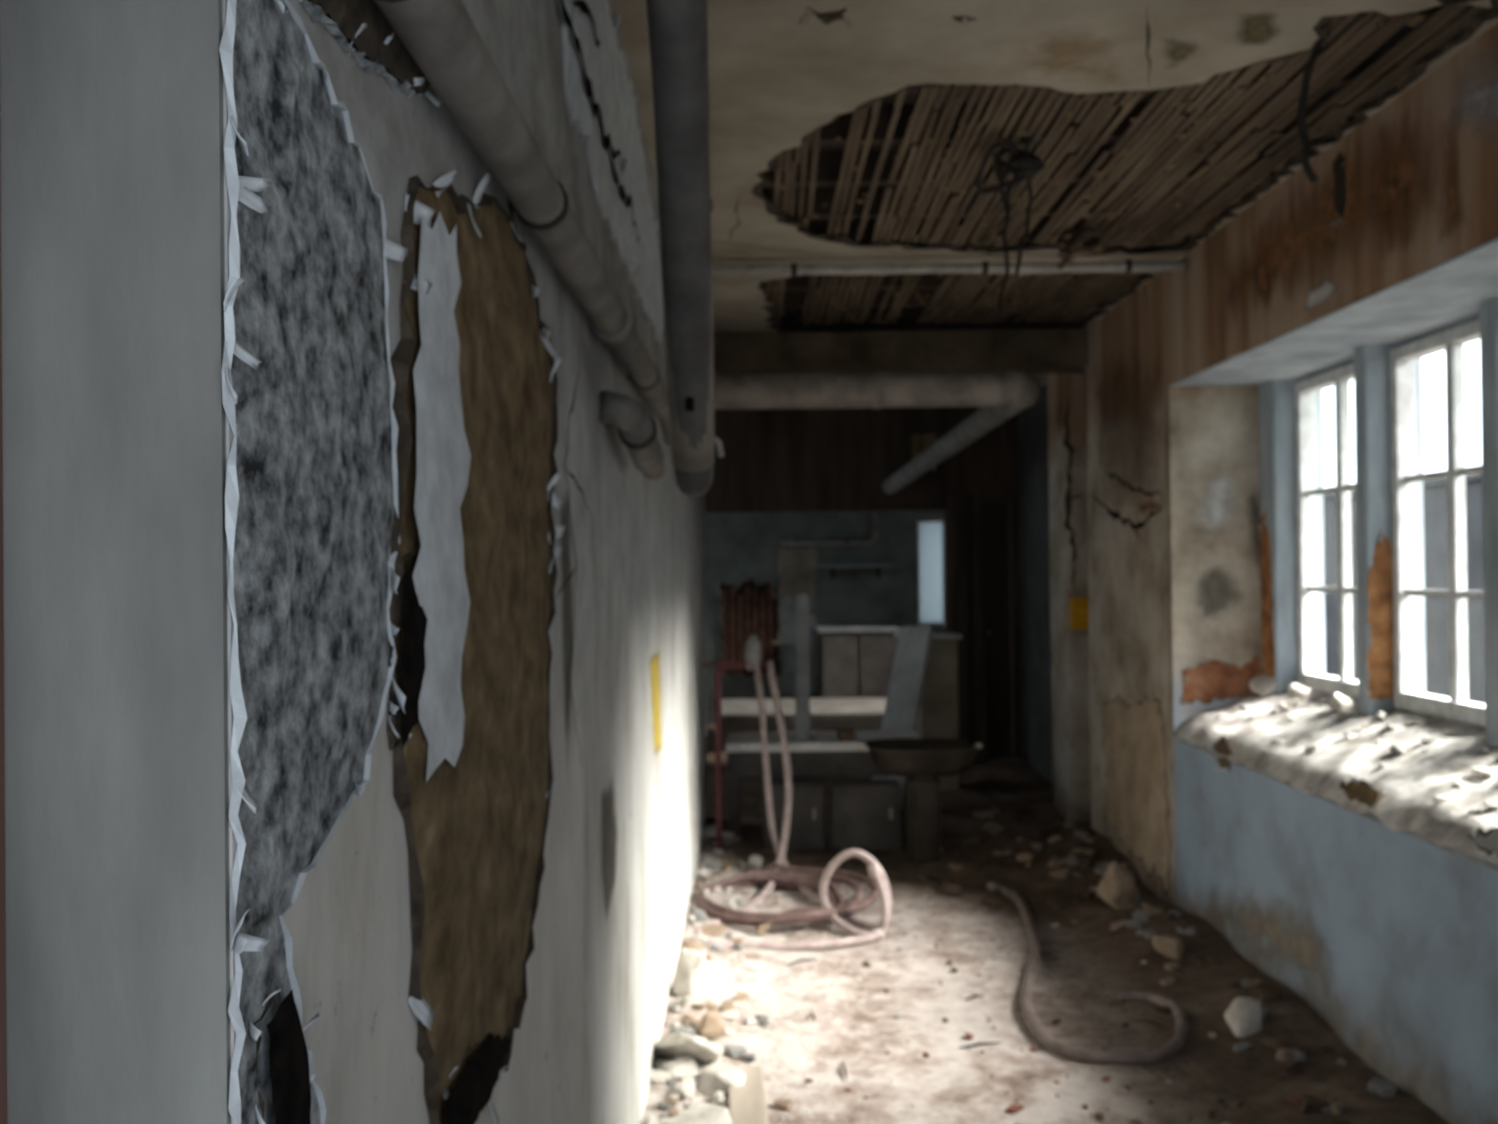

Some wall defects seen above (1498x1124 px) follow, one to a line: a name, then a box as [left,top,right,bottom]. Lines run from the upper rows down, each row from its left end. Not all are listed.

spalling [797,7,854,30]
spalling [1331,149,1350,227]
peeling [219,0,565,1124]
crack [1061,394,1172,705]
spalling [1180,655,1262,704]
spalling [1208,735,1232,772]
spalling [1339,776,1379,807]
spalling [1466,810,1498,855]